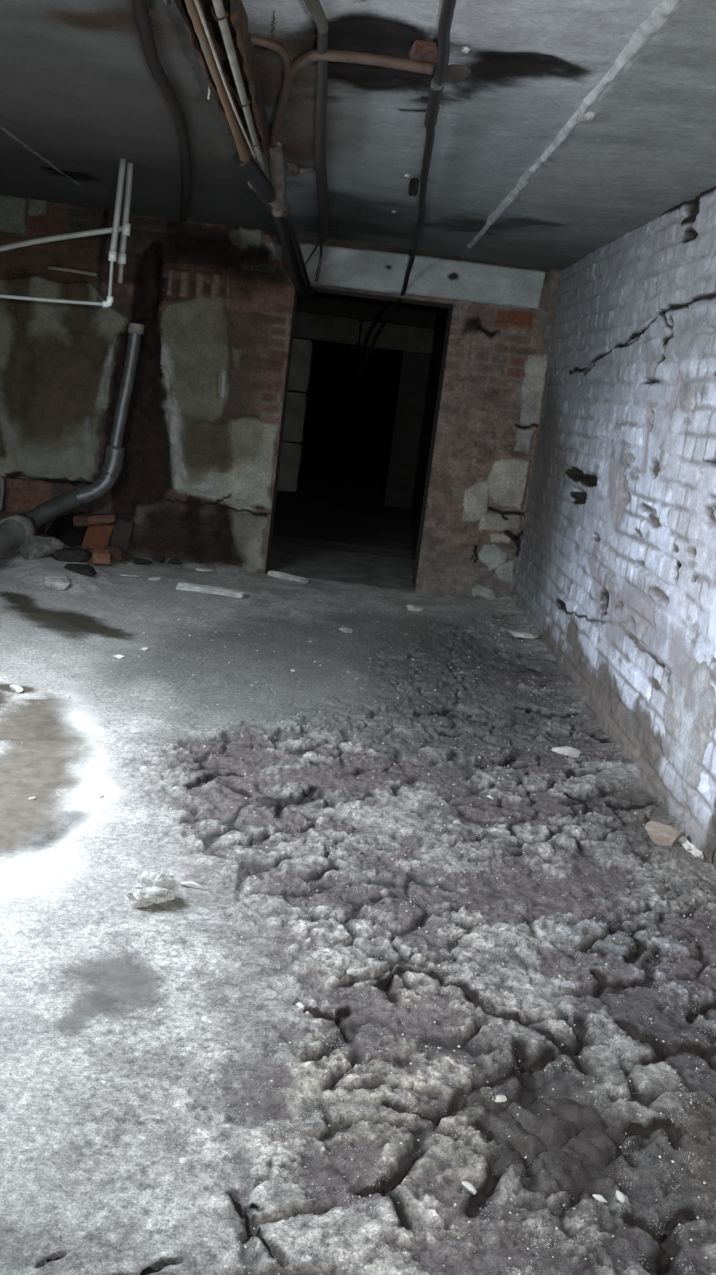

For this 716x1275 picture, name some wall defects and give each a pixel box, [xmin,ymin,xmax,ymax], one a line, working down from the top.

damp [353,76,413,90]
damp [480,52,585,74]
crack [569,292,716,376]
damp [0,241,244,566]
flaking render [462,354,548,600]
damp [0,592,131,638]
damp [0,684,118,902]
crack [186,772,319,819]
crack [303,1006,350,1043]
crack [355,925,716,1230]
crack [230,1194,283,1265]
crack [624,1209,695,1275]